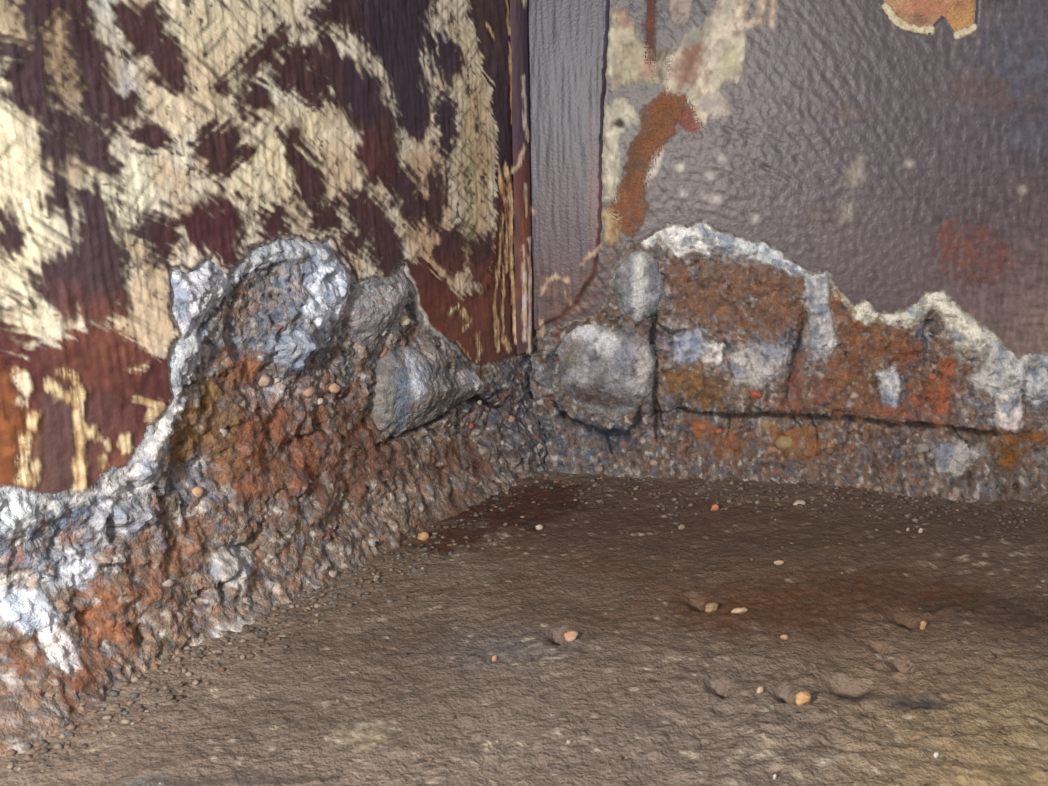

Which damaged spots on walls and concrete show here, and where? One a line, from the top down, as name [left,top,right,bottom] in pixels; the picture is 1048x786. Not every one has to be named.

rust [643,0,657,63]
flaking render [882,0,977,39]
rust [534,87,702,328]
peeling [580,0,776,265]
peeling [0,0,550,757]
rust [169,350,406,513]
spalling [526,221,1048,504]
crack [551,307,1023,452]
rust [828,295,966,426]